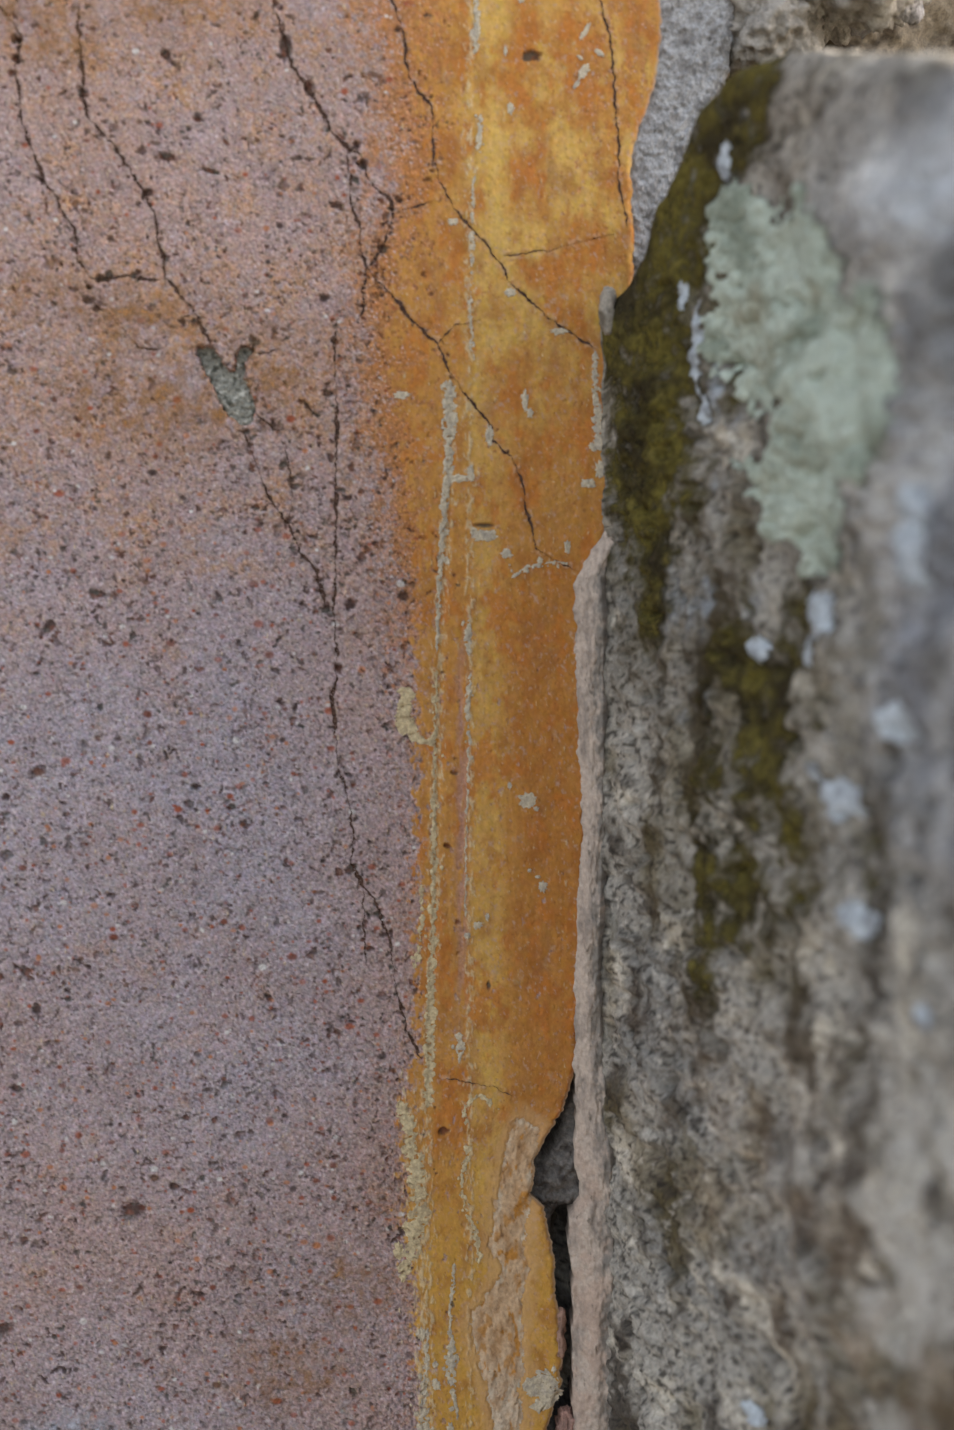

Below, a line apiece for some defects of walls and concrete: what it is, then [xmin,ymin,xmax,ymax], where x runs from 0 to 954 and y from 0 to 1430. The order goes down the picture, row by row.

crack [0,4,211,351]
spalling [629,0,735,278]
spalling [197,346,256,425]
crack [242,0,628,1058]
peeling [410,1077,579,1430]